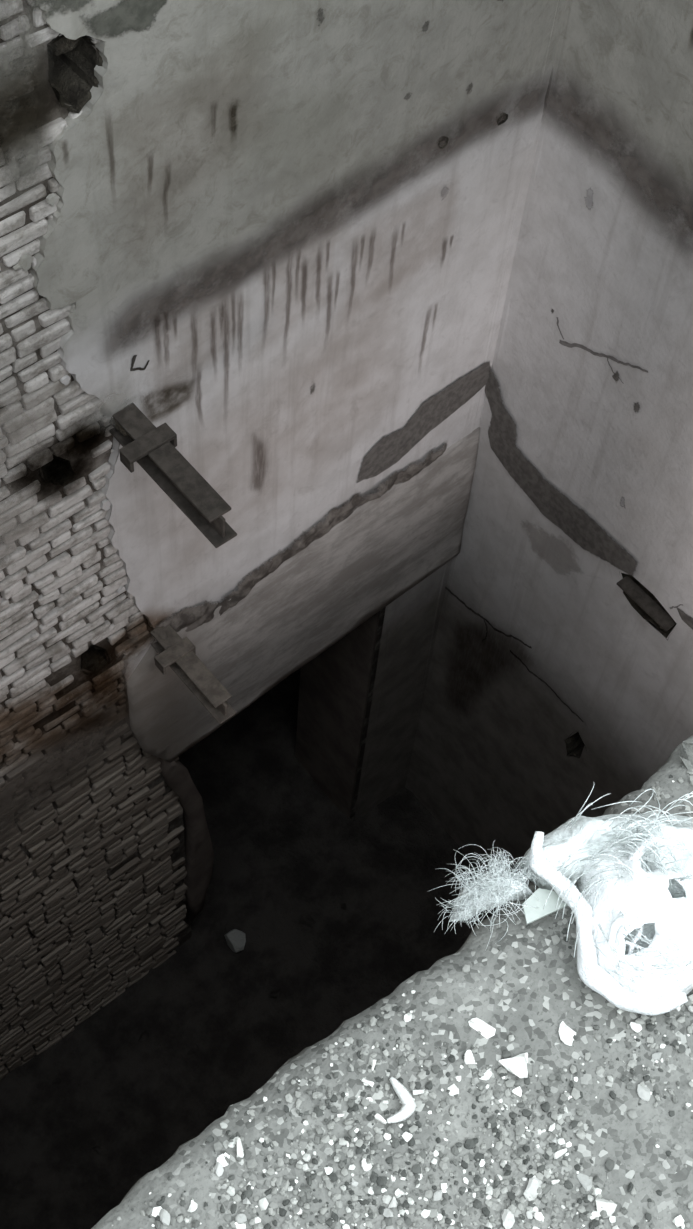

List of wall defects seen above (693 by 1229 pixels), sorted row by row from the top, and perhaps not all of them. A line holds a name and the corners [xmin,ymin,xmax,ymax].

crack [556,317,648,384]
spalling [0,0,509,1229]
spalling [617,573,693,638]